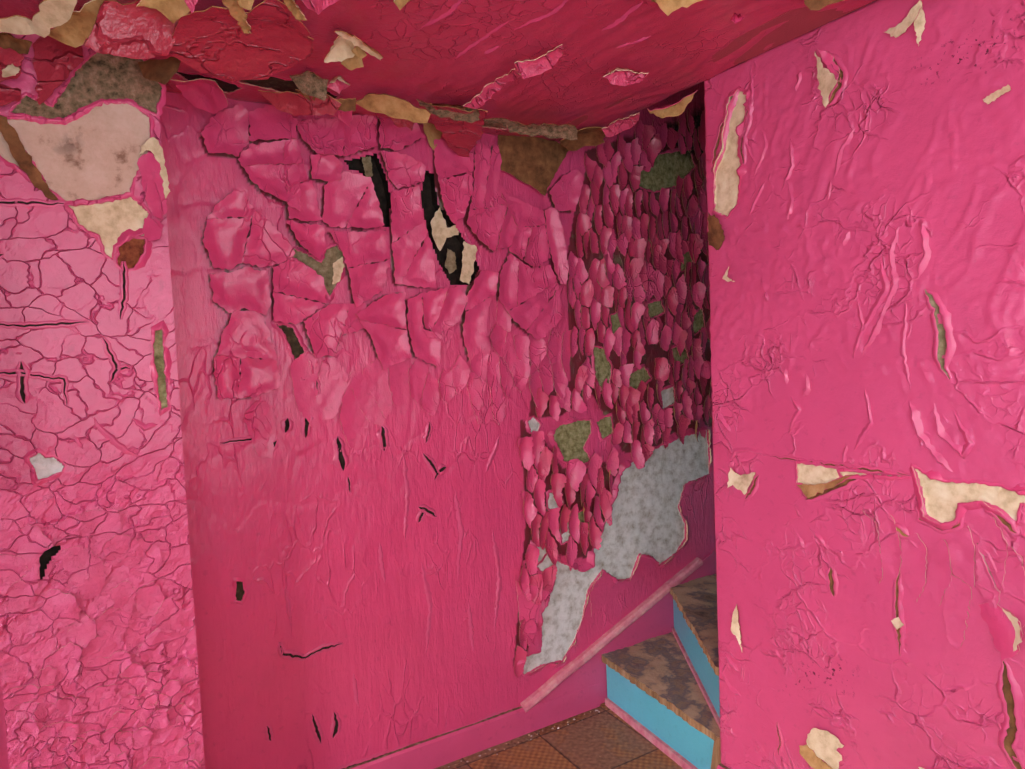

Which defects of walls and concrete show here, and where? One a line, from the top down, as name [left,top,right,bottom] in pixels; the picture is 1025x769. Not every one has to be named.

peeling [884,0,926,47]
peeling [814,49,840,108]
peeling [983,85,1011,104]
crack [0,198,69,208]
crack [0,261,131,383]
peeling [0,0,756,678]
crack [0,361,69,405]
crack [770,455,911,477]
crack [826,567,839,597]
crack [891,570,907,656]
peeling [0,508,194,769]
peeling [799,728,844,769]